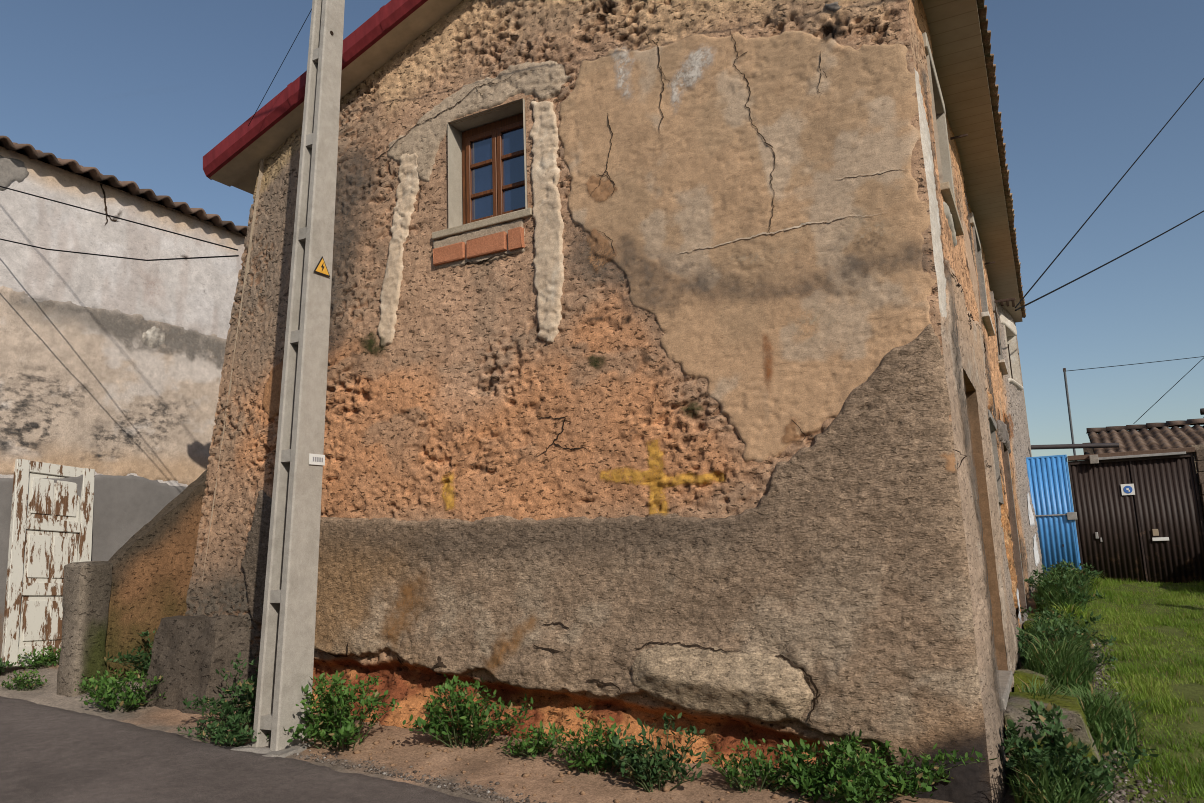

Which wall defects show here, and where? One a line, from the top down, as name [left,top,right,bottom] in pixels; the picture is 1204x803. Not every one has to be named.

crack [642,26,670,140]
crack [587,113,615,199]
crack [730,31,775,233]
crack [100,181,120,225]
peeling [377,153,420,347]
water stain [91,311,225,368]
crack [950,267,987,391]
water stain [0,374,73,450]
water stain [94,402,168,445]
peeling [529,2,1025,803]
crack [630,641,821,725]